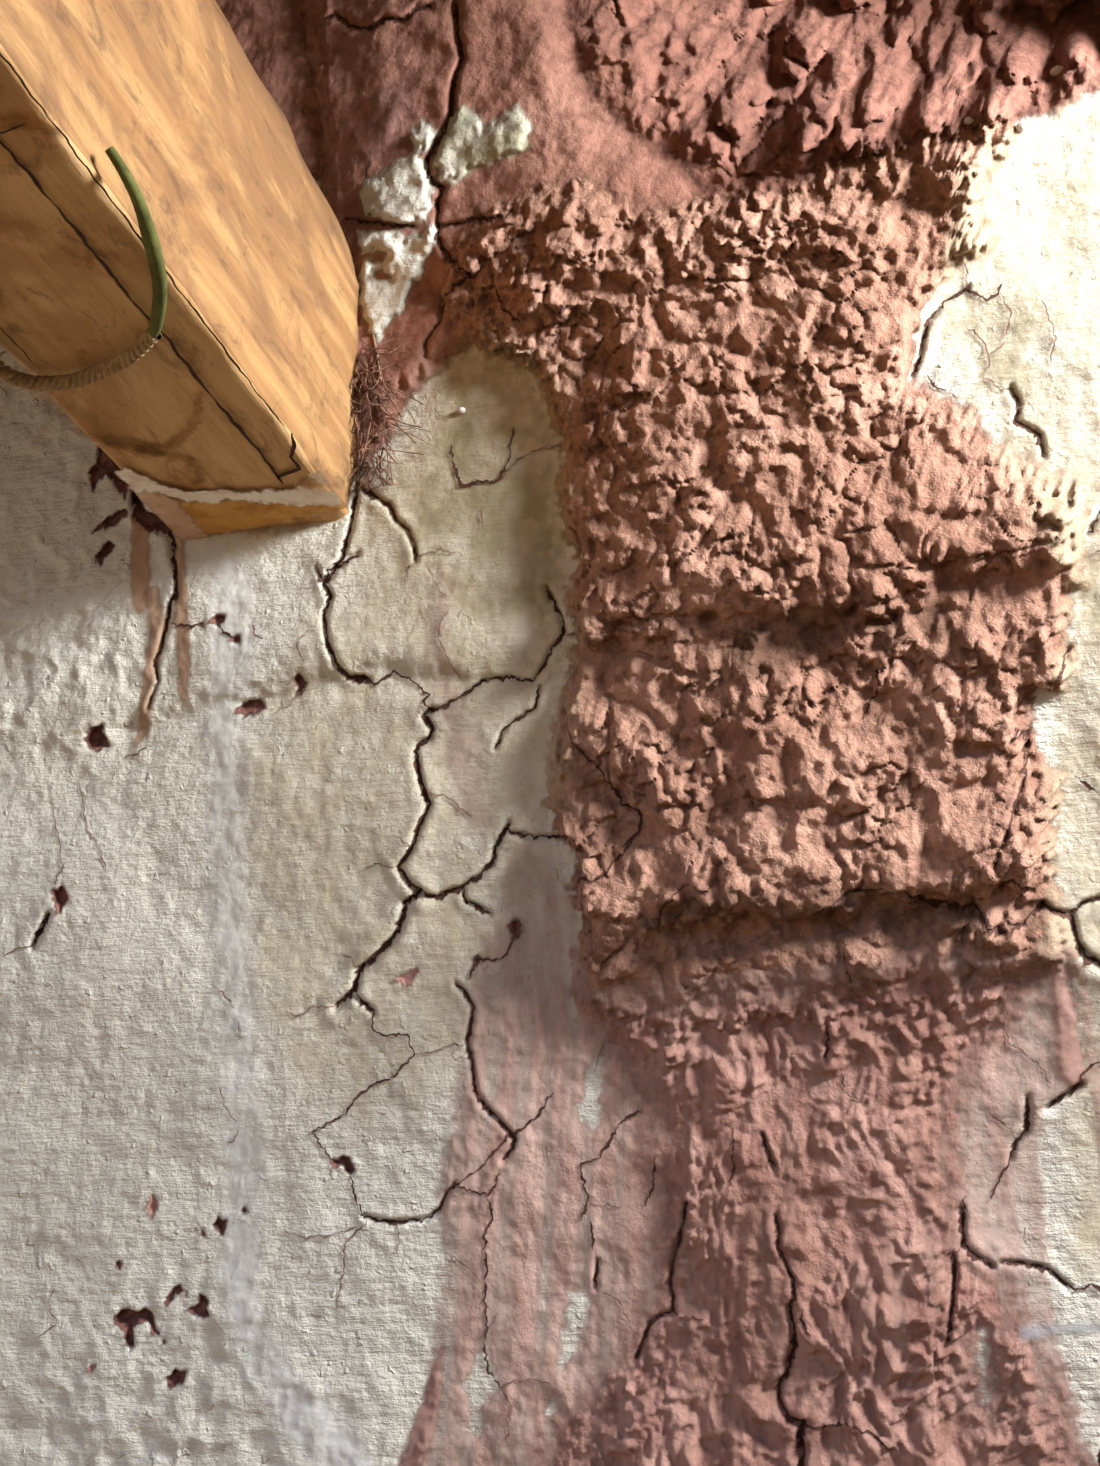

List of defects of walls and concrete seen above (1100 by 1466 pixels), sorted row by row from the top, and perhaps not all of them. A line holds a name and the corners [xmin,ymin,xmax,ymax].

crack [0,53,301,484]
crack [325,4,520,358]
crack [911,254,1057,457]
spalling [88,448,174,565]
spalling [50,886,68,914]
spalling [84,724,109,753]
water stain [130,509,191,745]
spalling [235,699,265,718]
crack [91,427,728,1441]
crack [814,727,1100,984]
crack [909,1012,1100,1378]
spalling [113,1285,209,1352]